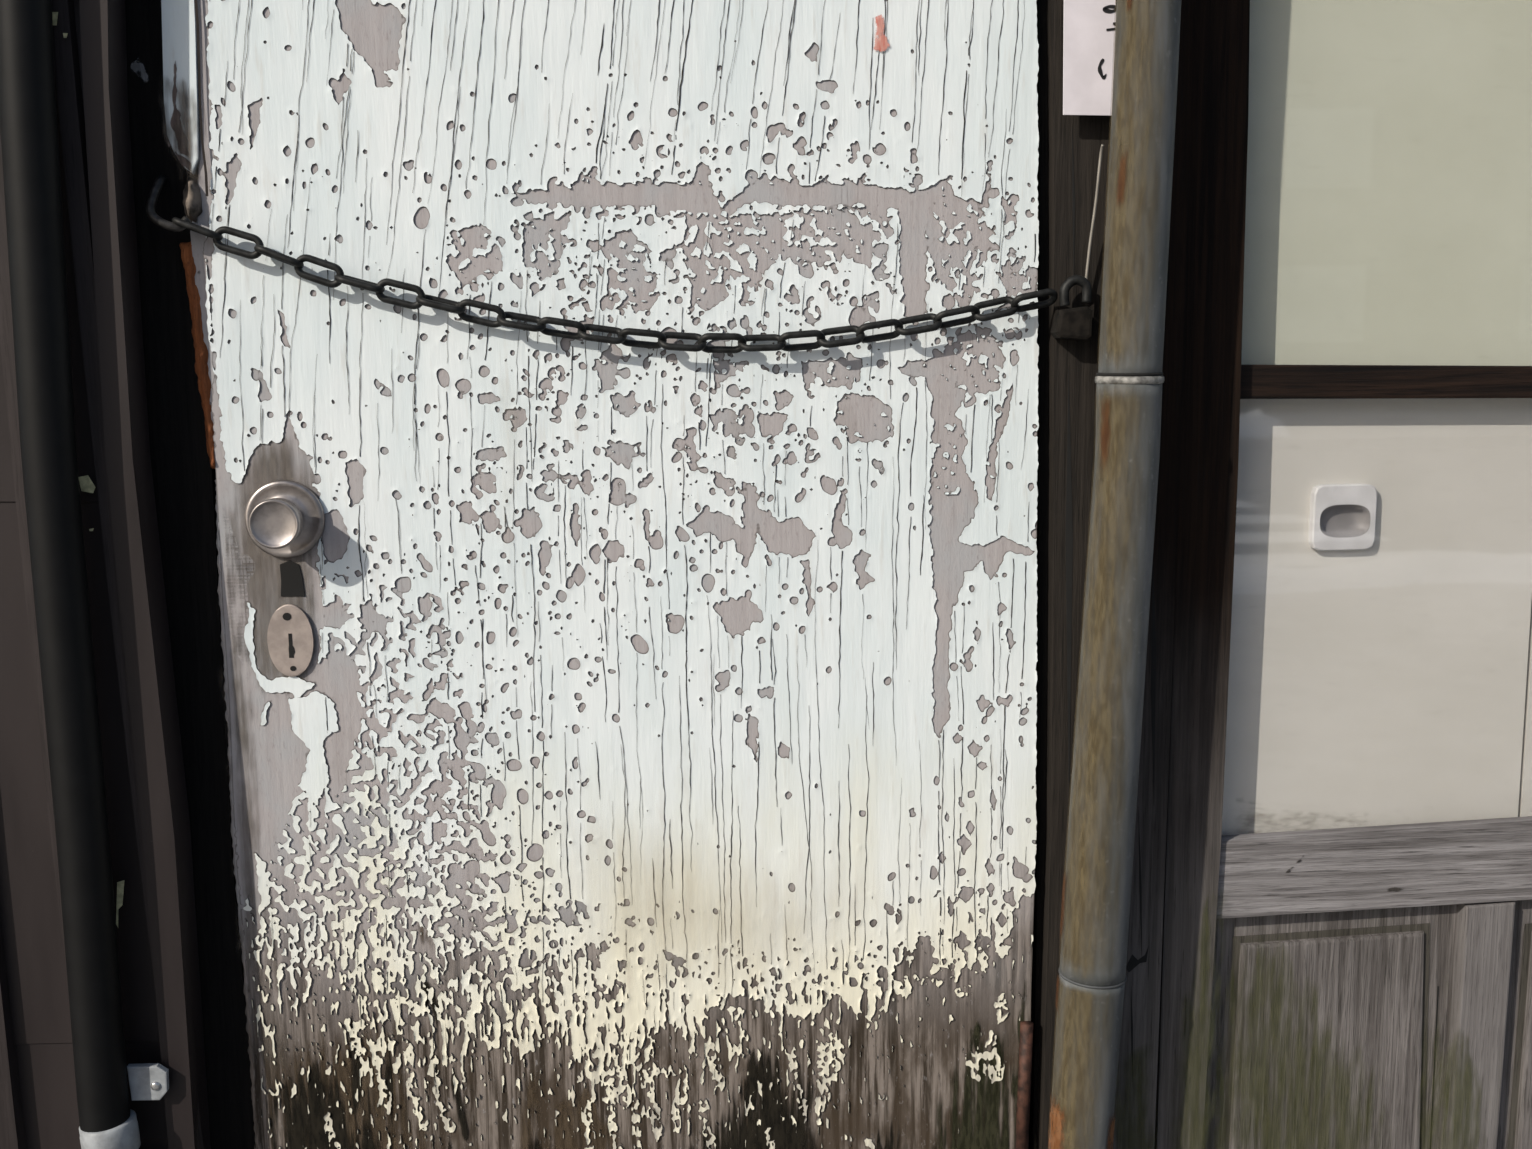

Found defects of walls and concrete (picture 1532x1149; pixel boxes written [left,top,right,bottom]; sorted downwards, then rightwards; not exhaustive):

peeling [167,0,1038,1149]
damp [421,982,451,1035]
damp [268,1016,425,1149]
damp [448,1067,468,1149]
damp [520,1075,618,1149]
damp [691,1051,816,1149]
damp [876,1124,898,1149]
damp [935,984,1025,1149]